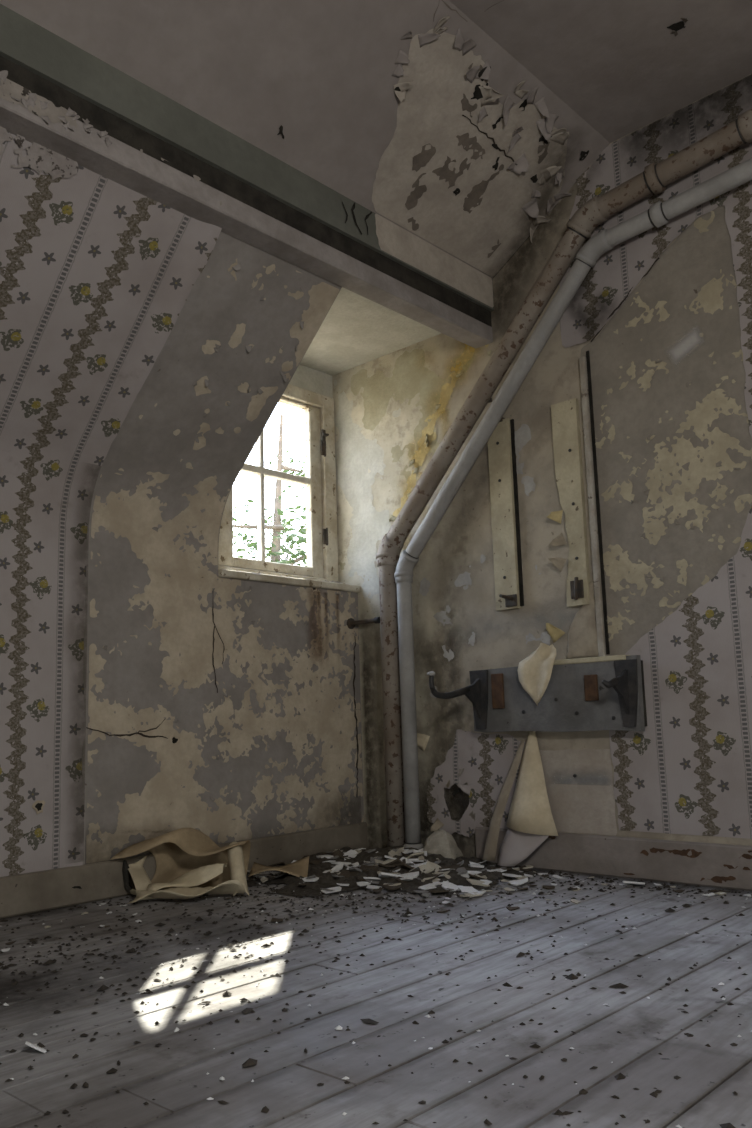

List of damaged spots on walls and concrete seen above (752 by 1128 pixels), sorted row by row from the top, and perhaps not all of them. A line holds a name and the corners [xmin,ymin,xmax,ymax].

peeling [0,70,112,147]
peeling [372,16,589,308]
peeling [613,292,670,341]
peeling [684,269,737,315]
peeling [180,264,339,469]
peeling [515,424,536,496]
peeling [595,359,752,550]
peeling [86,344,492,863]
peeling [603,544,709,641]